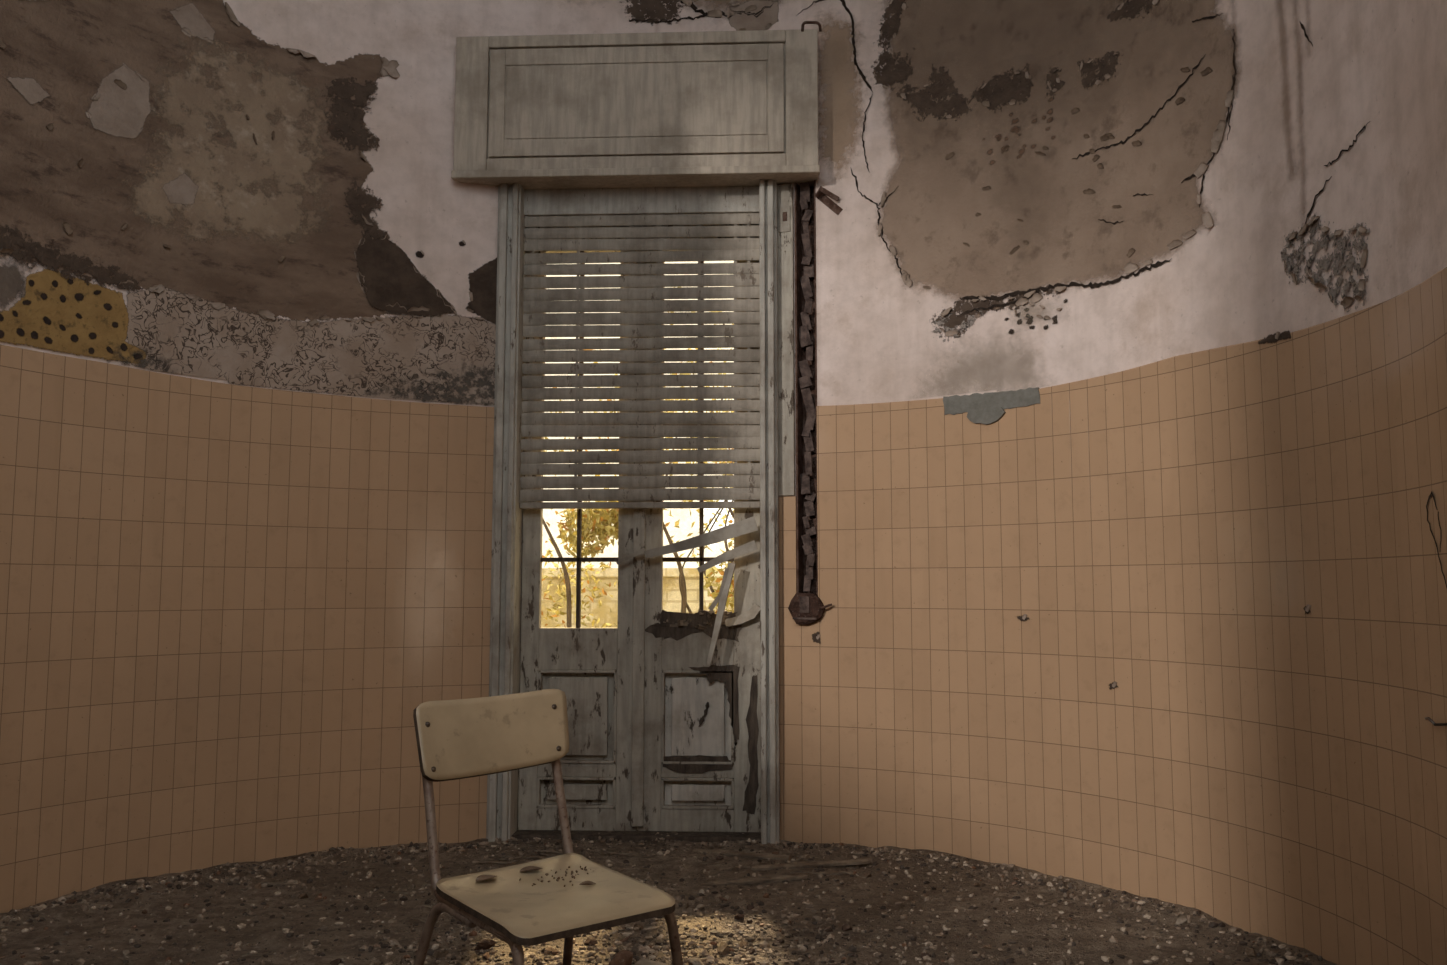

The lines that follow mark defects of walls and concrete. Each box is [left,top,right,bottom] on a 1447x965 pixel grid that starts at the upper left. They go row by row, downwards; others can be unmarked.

peeling [0,0,497,325]
peeling [624,0,779,31]
crack [629,0,906,285]
peeling [873,0,1124,121]
peeling [1107,0,1159,21]
crack [1073,13,1237,225]
spalling [1281,121,1371,312]
spalling [932,290,1068,342]
crack [1426,491,1447,588]